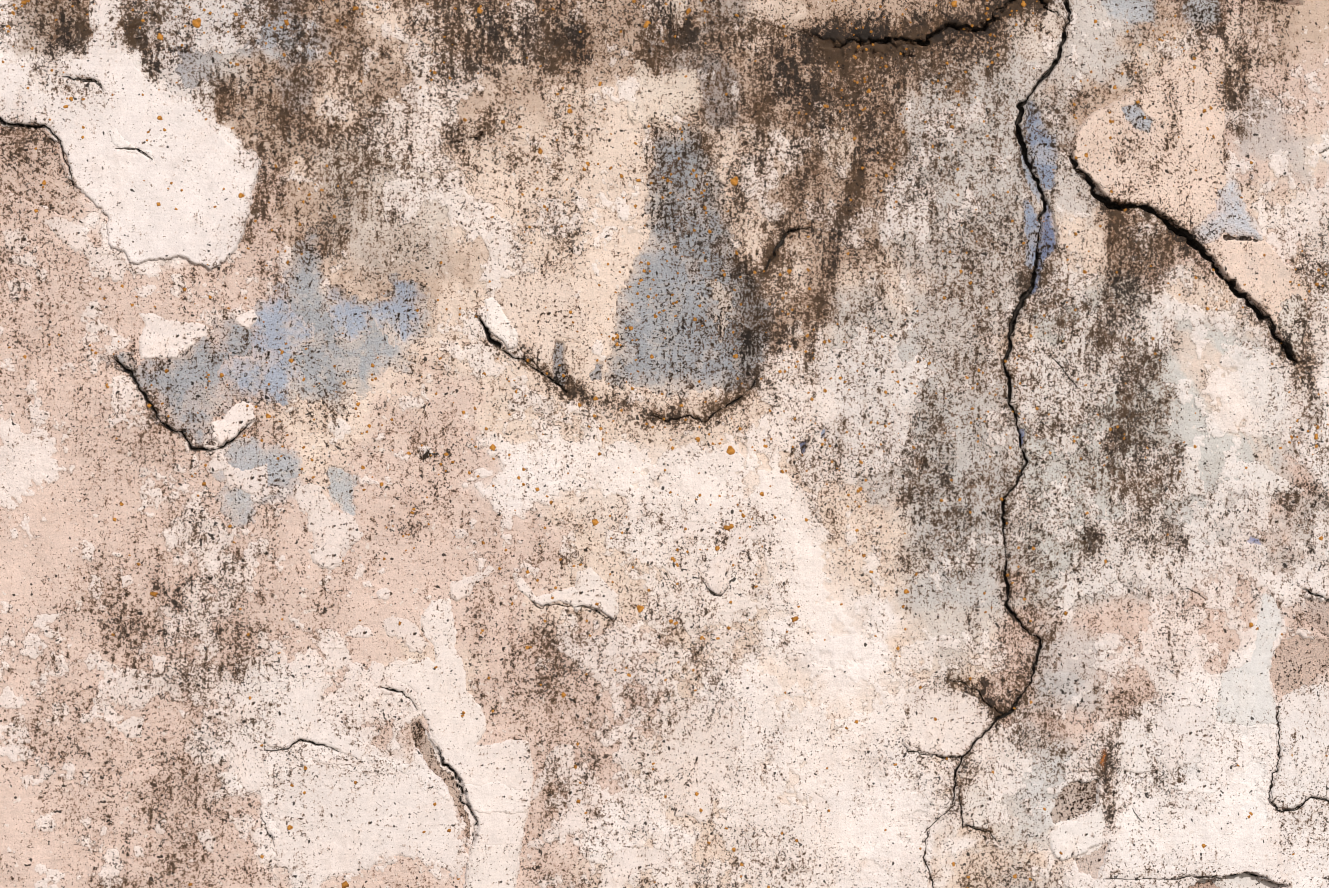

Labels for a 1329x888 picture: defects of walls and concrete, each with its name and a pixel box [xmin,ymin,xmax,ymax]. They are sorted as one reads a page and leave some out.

peeling [0,0,263,282]
peeling [97,227,436,570]
peeling [484,272,588,388]
peeling [589,60,772,399]
crack [834,0,1071,888]
crack [1070,156,1297,362]
peeling [1190,177,1263,245]
peeling [228,565,587,888]
peeling [512,567,620,619]
peeling [644,695,744,826]
peeling [671,522,772,595]
peeling [1120,593,1329,814]